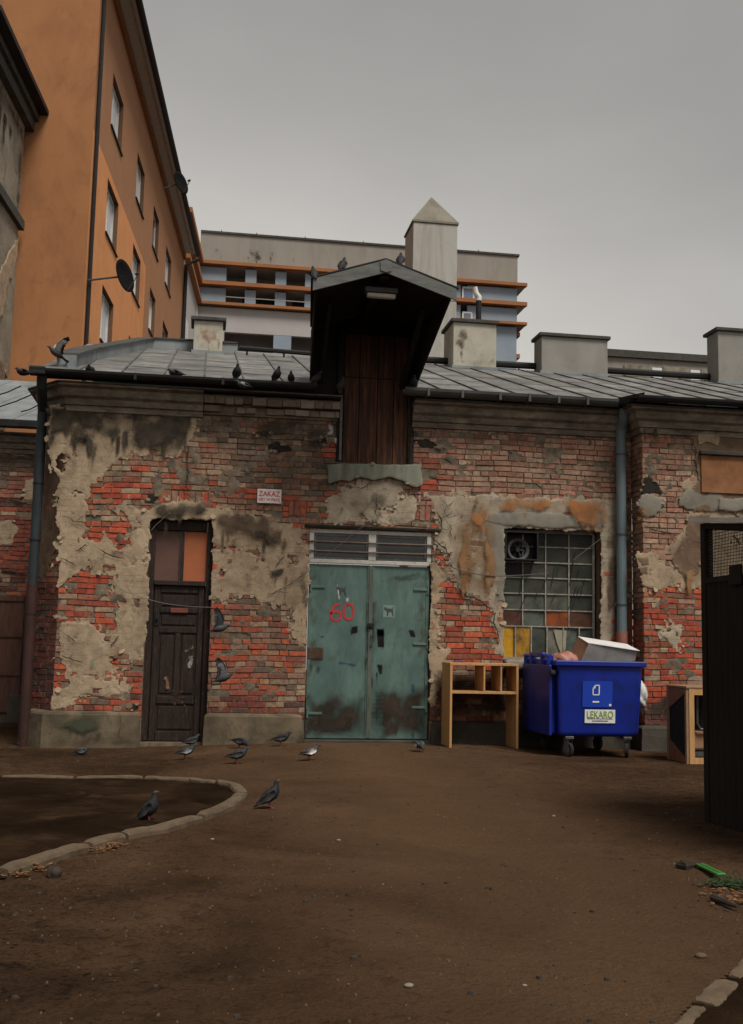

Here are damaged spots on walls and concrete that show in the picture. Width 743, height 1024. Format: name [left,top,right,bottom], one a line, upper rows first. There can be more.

peeling [0,359,8,380]
damp [49,408,191,461]
damp [217,514,286,554]
peeling [0,404,743,711]
corrosion [459,500,495,595]
corrosion [569,499,606,530]
corrosion [305,692,424,734]